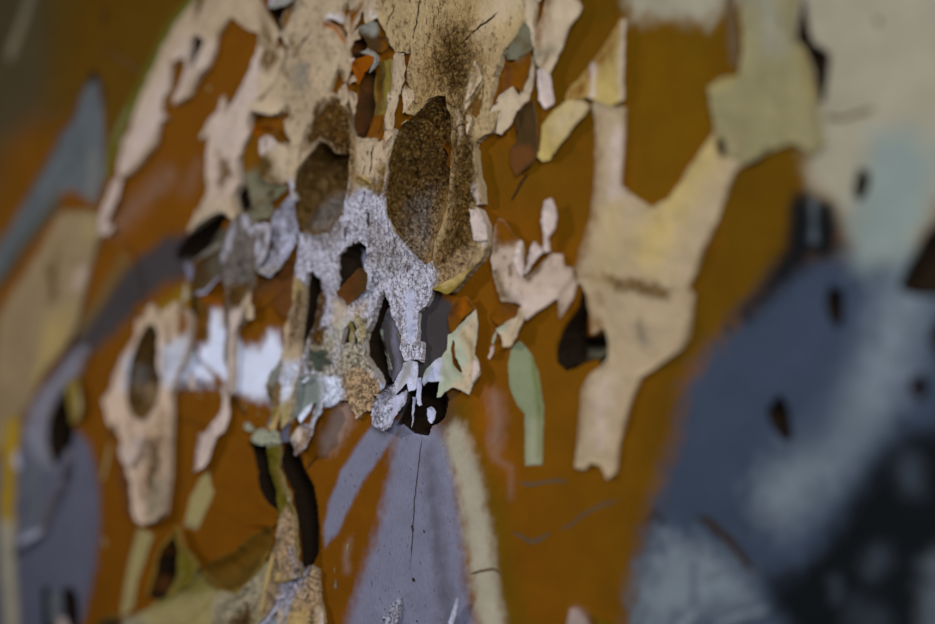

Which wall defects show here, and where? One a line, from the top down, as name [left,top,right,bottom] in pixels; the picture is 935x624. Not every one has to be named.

peeling [10,0,830,551]
spalling [42,588,79,624]
peeling [122,444,327,624]
peeling [568,608,611,624]